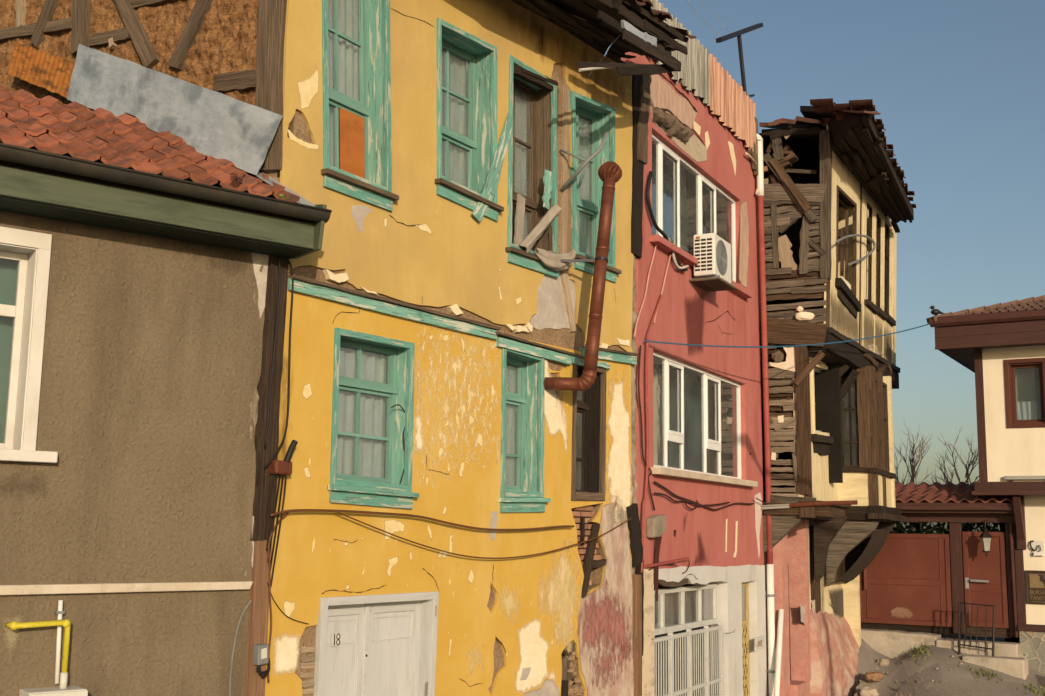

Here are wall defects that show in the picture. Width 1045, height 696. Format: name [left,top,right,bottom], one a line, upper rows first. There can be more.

peeling [298,69,319,110]
peeling [650,74,710,162]
peeling [287,129,319,149]
peeling [728,141,736,175]
spalling [323,269,349,283]
spalling [446,304,463,315]
flaking render [503,271,576,333]
peeling [415,324,500,488]
peeling [385,519,404,540]
peeling [515,375,634,696]
spalling [645,557,712,587]
peeling [274,635,299,674]